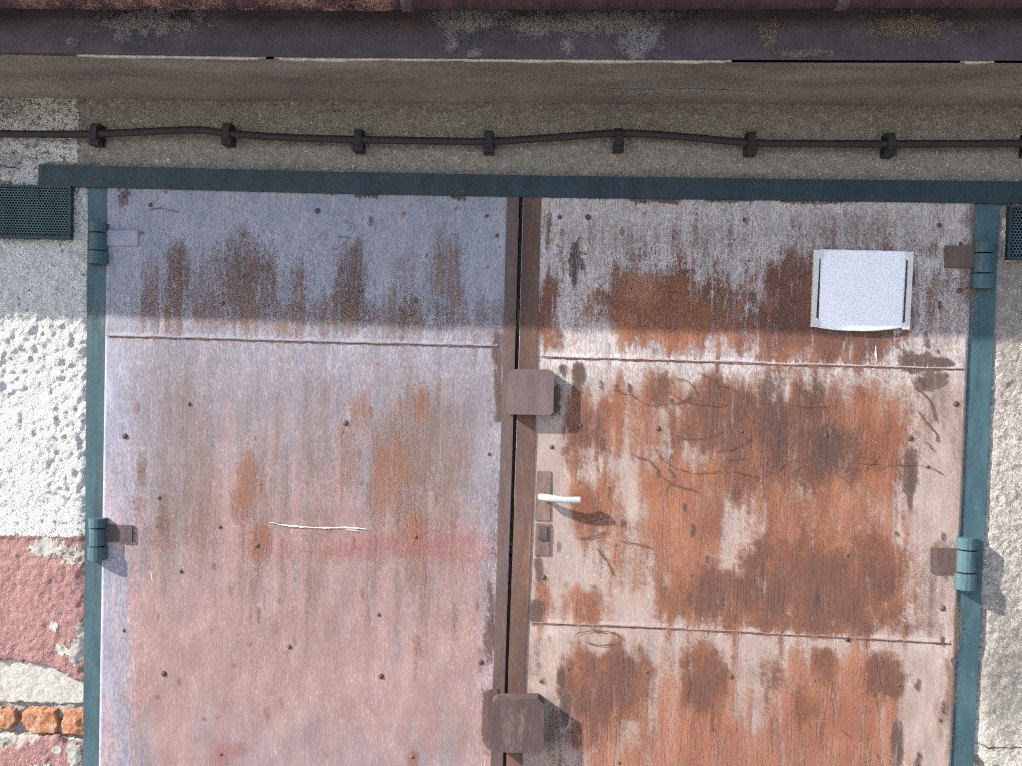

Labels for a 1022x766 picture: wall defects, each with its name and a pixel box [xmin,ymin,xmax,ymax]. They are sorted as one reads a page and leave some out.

rust [631,199,684,214]
rust [142,230,423,339]
rust [425,240,504,425]
peeling [27,535,85,567]
rust [230,366,473,655]
rust [474,531,498,667]
rust [527,204,975,766]
flaking render [0,621,84,766]
rust [480,686,489,755]